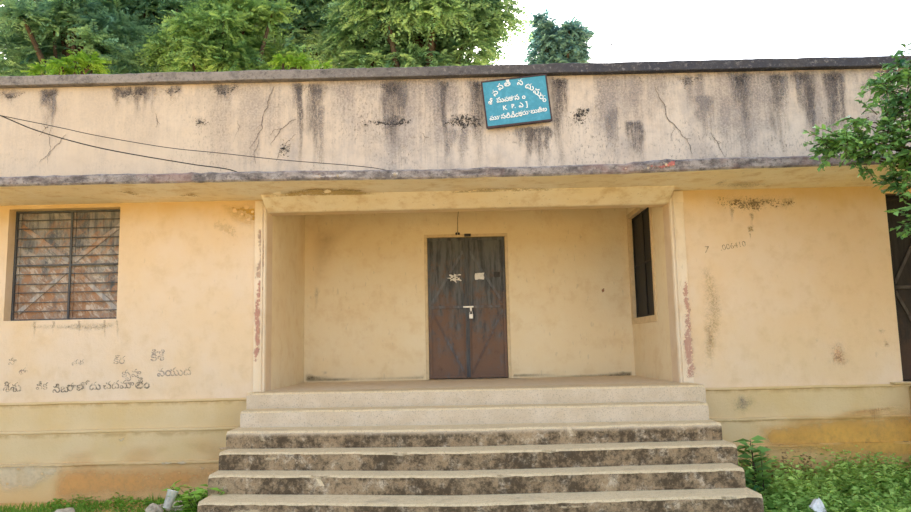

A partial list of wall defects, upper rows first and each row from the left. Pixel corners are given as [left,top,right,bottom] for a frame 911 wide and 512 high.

water stain [114,87,147,100]
crack [237,87,296,163]
water stain [293,84,322,136]
water stain [360,81,411,133]
water stain [436,81,481,143]
water stain [517,79,567,152]
water stain [626,122,643,144]
crack [655,87,725,157]
water stain [770,73,814,126]
water stain [823,73,845,128]
water stain [721,197,795,211]